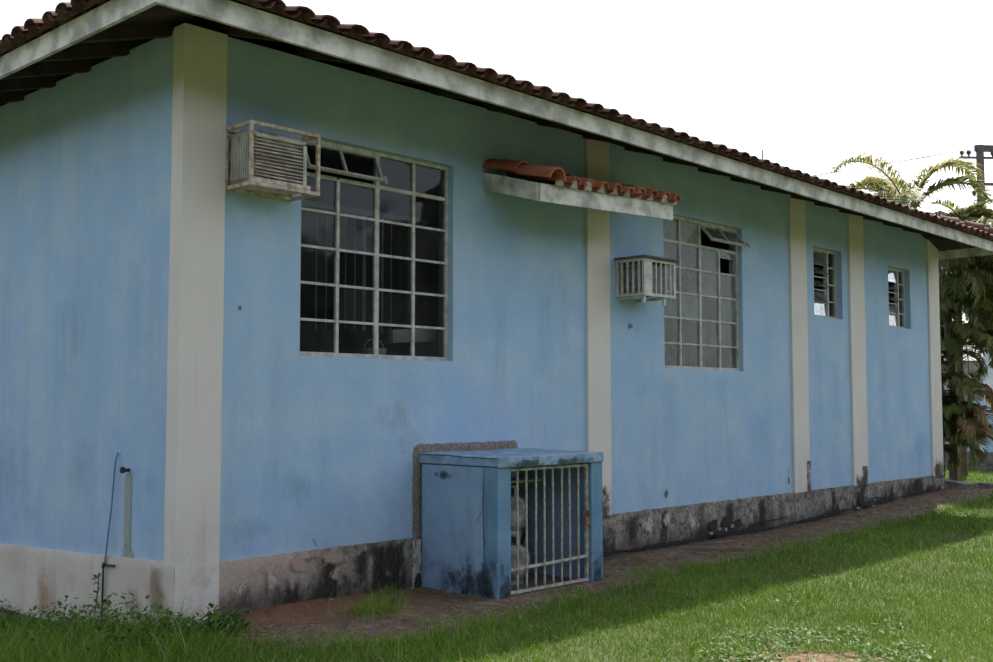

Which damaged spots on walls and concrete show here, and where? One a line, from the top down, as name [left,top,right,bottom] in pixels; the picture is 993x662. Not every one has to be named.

leakage [824,466,868,518]
leakage [882,478,935,502]
leakage [594,492,615,582]
leakage [274,543,406,606]